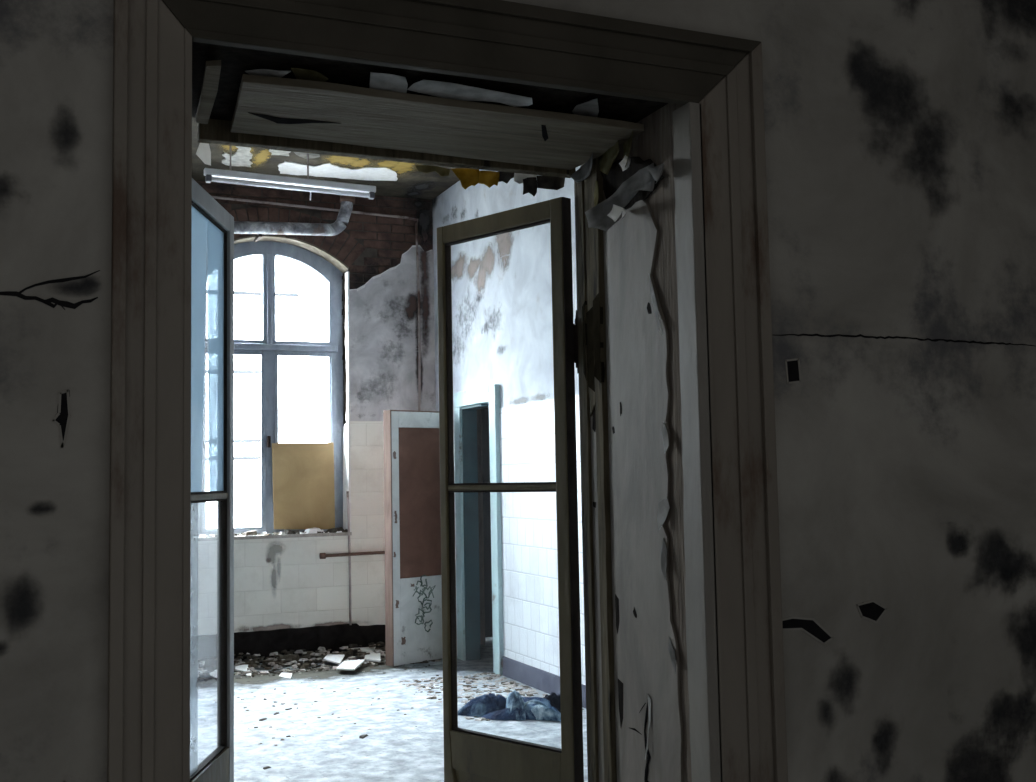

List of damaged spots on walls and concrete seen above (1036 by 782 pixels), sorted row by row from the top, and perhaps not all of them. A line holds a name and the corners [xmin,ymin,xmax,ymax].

peeling [245,68,328,82]
peeling [370,72,533,107]
peeling [572,98,599,117]
peeling [196,143,253,167]
peeling [269,149,398,181]
peeling [415,131,665,231]
damp [451,232,512,300]
flaking render [196,181,433,425]
damp [268,545,282,588]
crack [630,694,651,782]